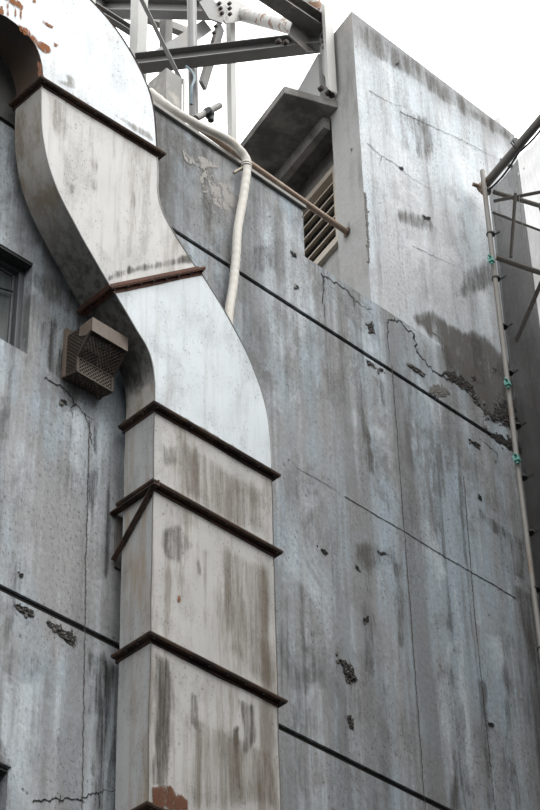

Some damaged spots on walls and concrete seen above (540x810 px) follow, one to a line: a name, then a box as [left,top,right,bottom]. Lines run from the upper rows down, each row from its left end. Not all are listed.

rust [0,0,57,53]
crack [321,273,369,312]
water stain [48,322,63,375]
spalling [429,370,520,453]
crack [298,318,517,810]
spalling [14,603,35,618]
spalling [47,620,77,646]
crack [33,377,114,810]
water stain [516,589,540,667]
rust [152,785,188,810]
water stain [452,753,462,810]